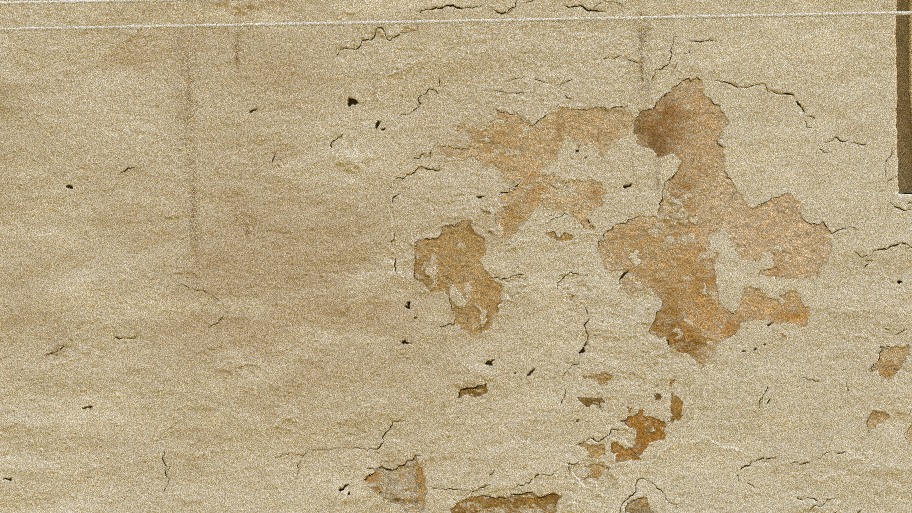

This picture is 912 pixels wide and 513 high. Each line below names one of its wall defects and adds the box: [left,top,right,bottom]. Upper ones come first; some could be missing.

crack [337,0,533,55]
crack [565,1,622,12]
crack [715,80,866,153]
crack [390,143,440,203]
peeling [413,77,838,369]
peeling [870,345,911,380]
peeling [363,454,427,513]
peeling [450,492,561,513]
crack [517,429,619,486]
peeling [577,380,683,480]
crack [620,478,677,513]
peeling [867,411,890,432]